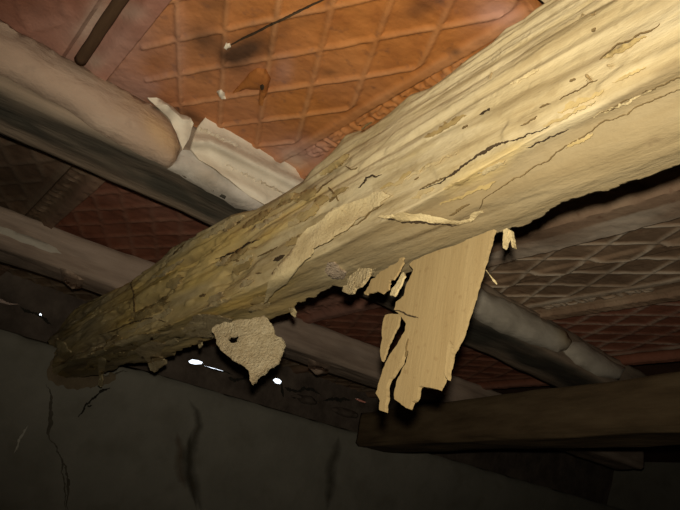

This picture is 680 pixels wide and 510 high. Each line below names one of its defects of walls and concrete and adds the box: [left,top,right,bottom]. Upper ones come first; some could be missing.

crack [599,23,660,60]
crack [346,77,680,229]
peeling [264,191,392,303]
peeling [182,291,286,385]
crack [46,385,70,509]
crack [78,388,110,417]